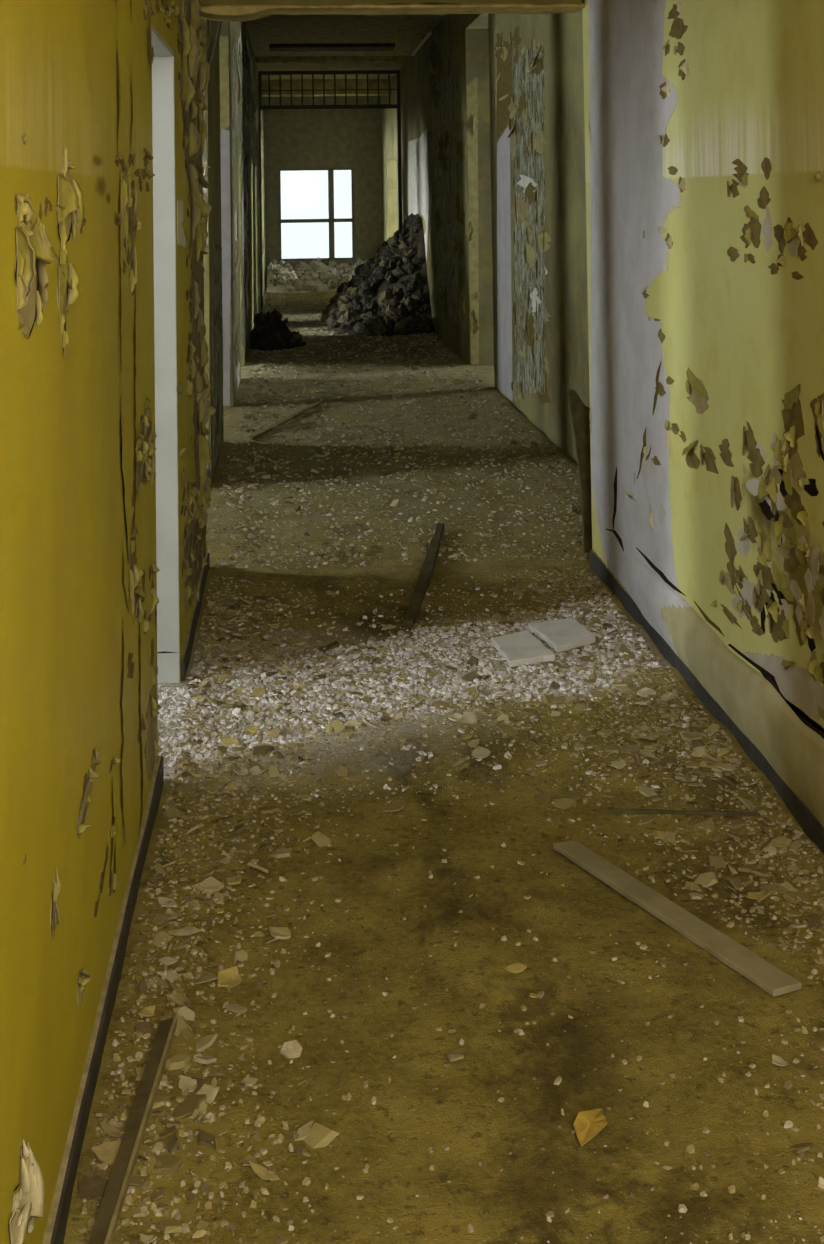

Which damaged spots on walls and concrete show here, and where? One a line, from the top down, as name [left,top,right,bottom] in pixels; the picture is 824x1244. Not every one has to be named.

peeling [408,27,551,404]
flaking render [582,0,824,721]